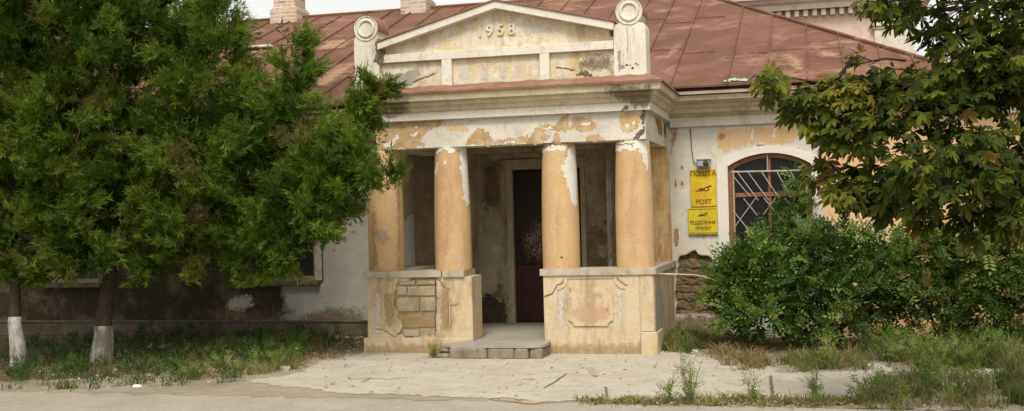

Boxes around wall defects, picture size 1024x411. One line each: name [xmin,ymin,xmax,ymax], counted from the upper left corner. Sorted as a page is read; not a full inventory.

peeling [716,123,798,152]
peeling [375,105,649,267]
spalling [673,227,722,316]
peeling [228,294,253,311]
spalling [395,278,437,338]